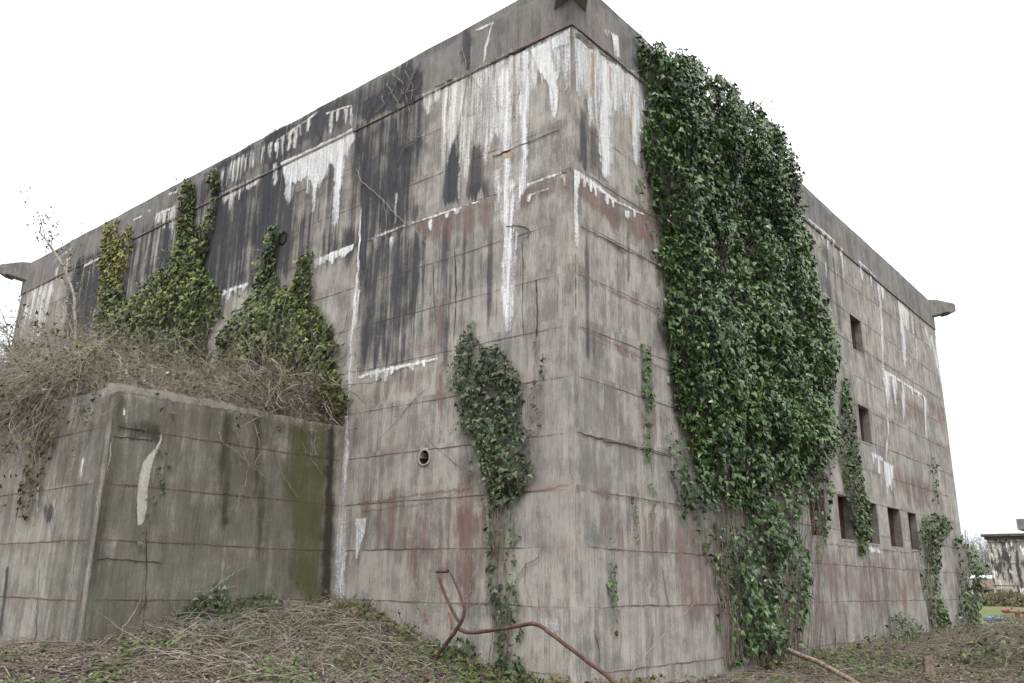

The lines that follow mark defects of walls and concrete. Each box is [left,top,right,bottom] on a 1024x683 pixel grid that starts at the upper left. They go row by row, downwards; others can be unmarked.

peeling [137,434,162,525]
leakage [20,23,663,598]
leakage [859,261,941,491]